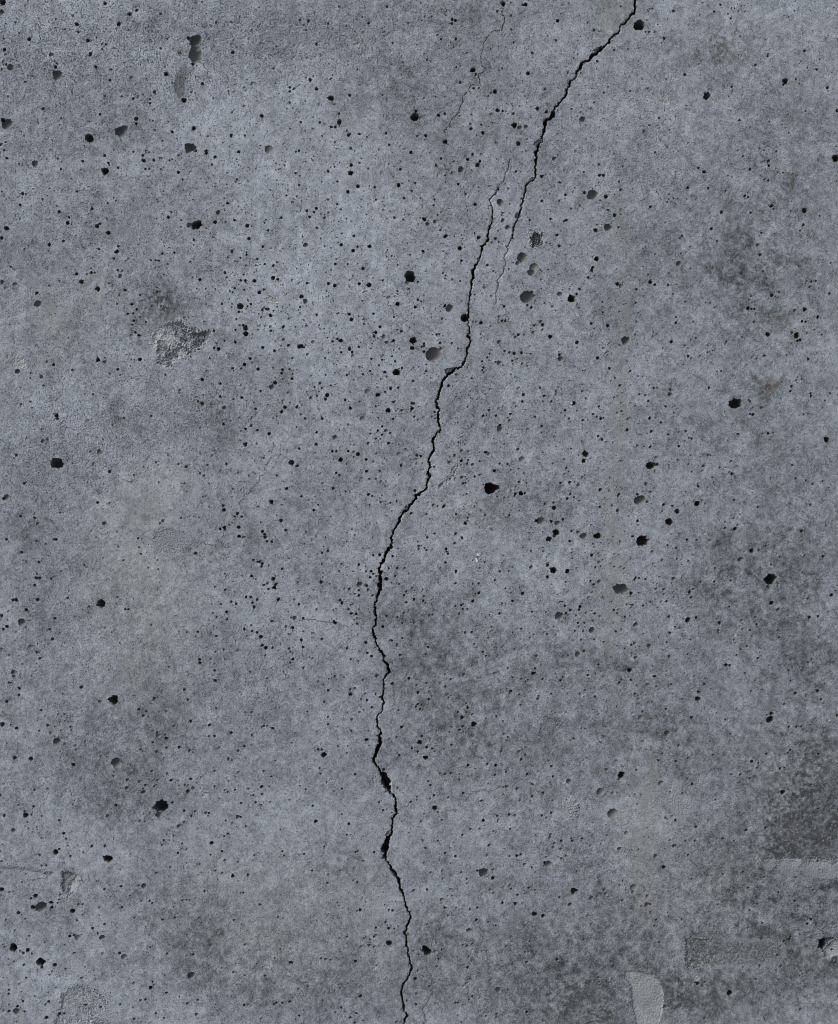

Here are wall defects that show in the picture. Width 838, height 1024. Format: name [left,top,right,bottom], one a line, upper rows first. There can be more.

crack [304,0,637,1024]